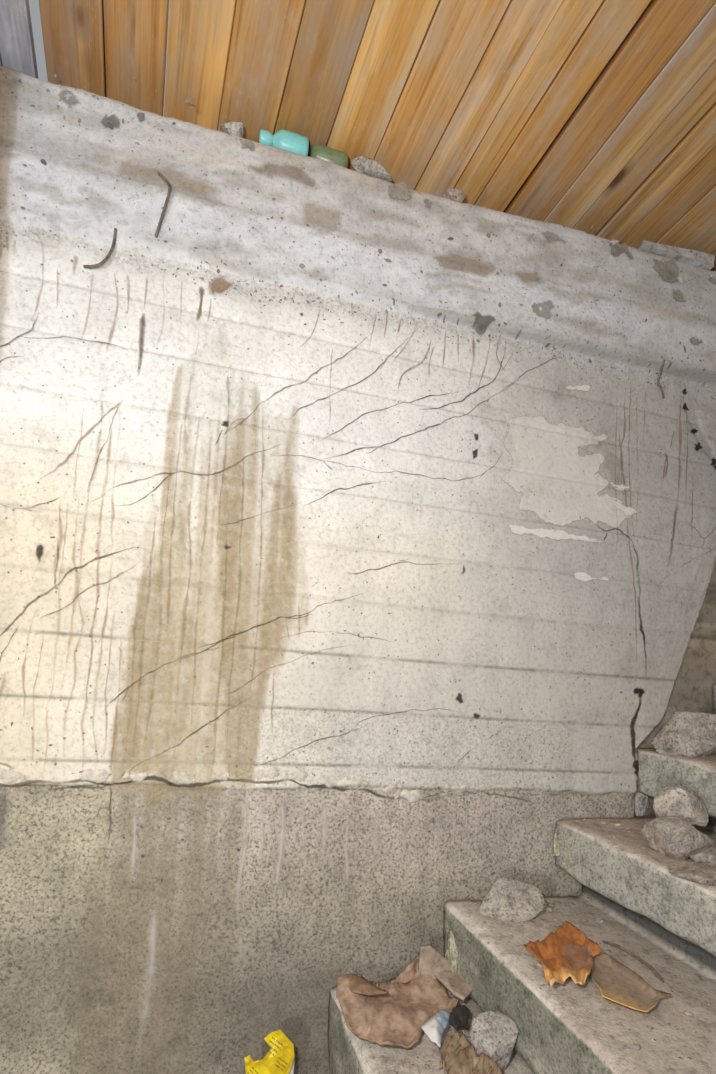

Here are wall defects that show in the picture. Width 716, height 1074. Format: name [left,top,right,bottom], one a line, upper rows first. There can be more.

crack [0,322,117,362]
crack [61,405,117,464]
crack [115,473,171,506]
crack [216,345,401,443]
crack [293,357,554,504]
peeling [502,416,637,543]
crack [0,551,120,659]
water stain [119,438,255,882]
crack [115,600,337,699]
peeling [573,572,609,582]
crack [638,597,646,655]
crack [631,688,644,776]